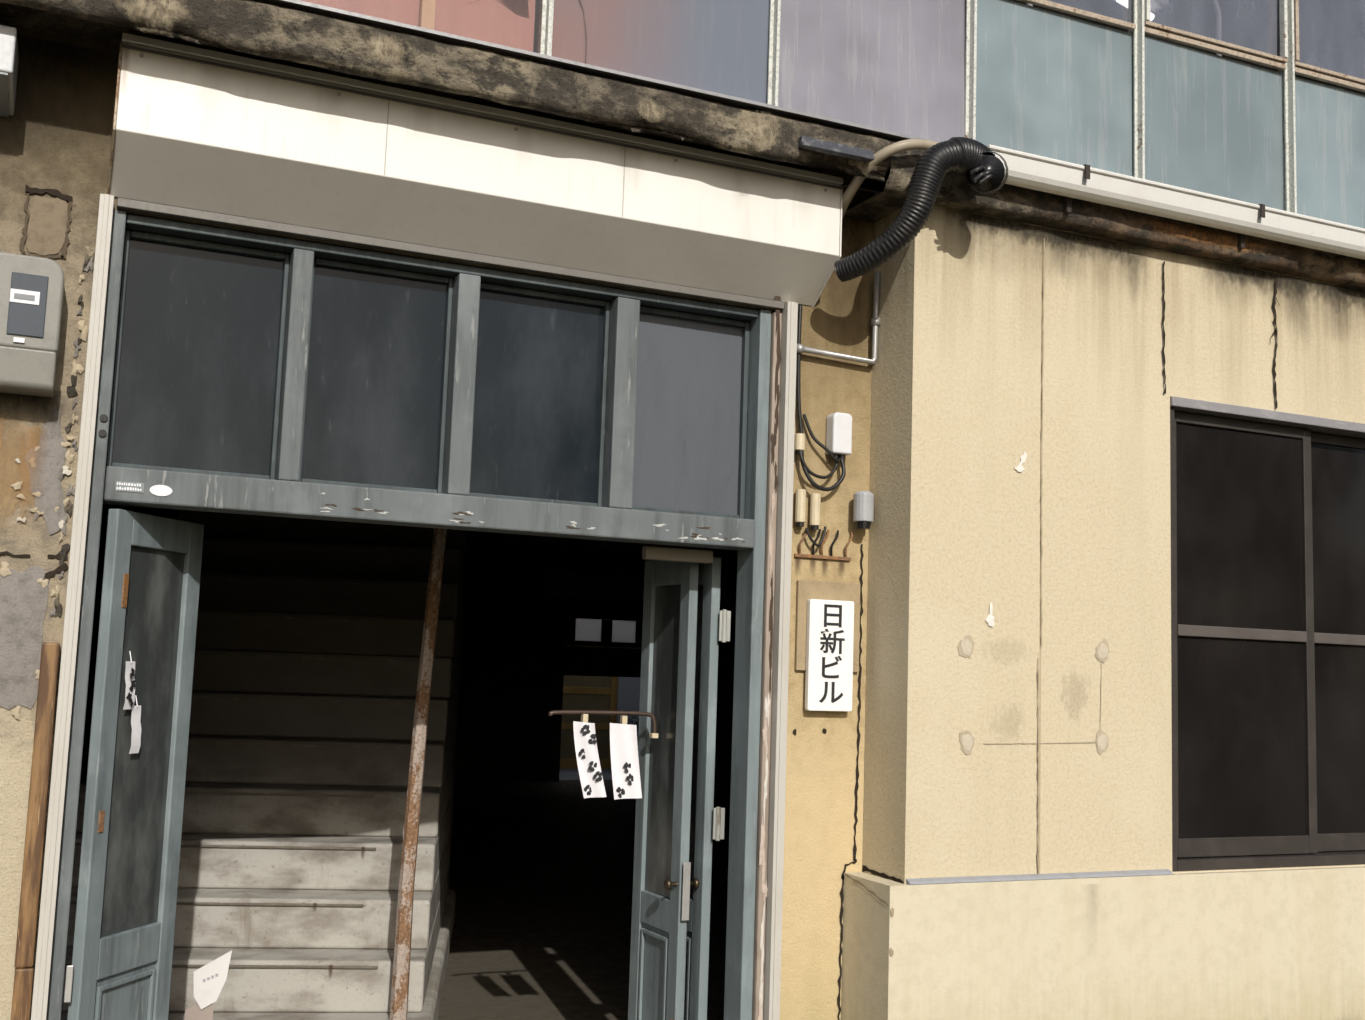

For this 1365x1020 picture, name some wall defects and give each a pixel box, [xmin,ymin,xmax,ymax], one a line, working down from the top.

spalling [19,185,73,258]
water stain [1219,262,1365,302]
spalling [0,246,95,720]